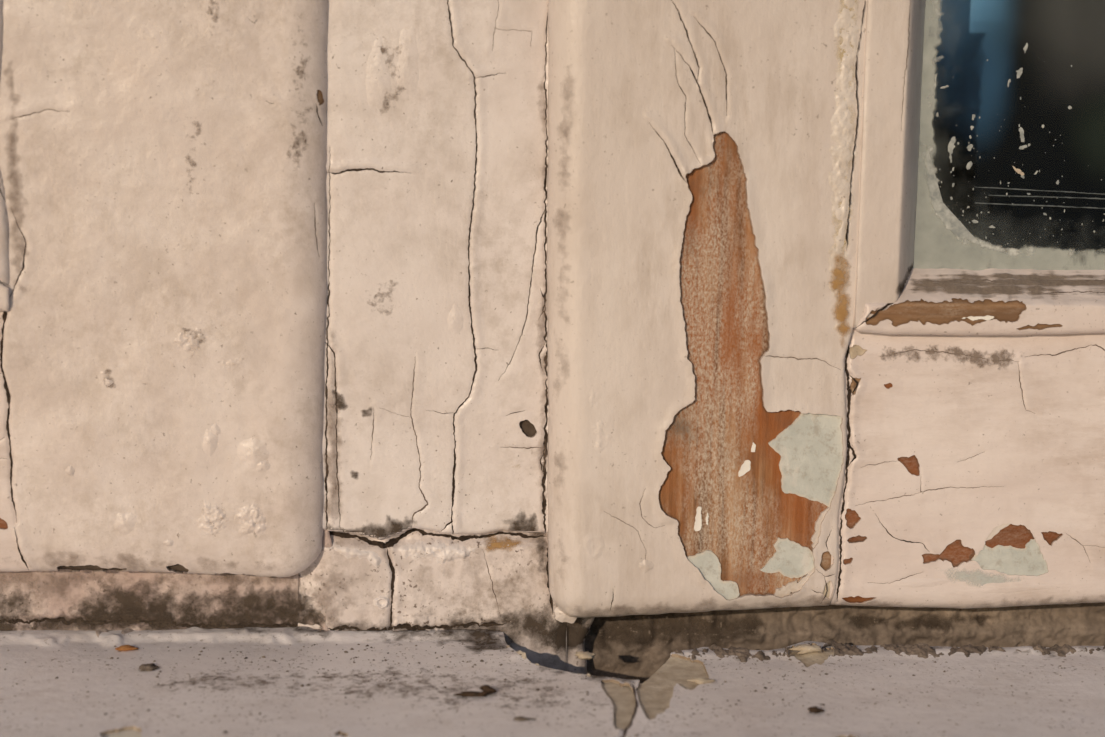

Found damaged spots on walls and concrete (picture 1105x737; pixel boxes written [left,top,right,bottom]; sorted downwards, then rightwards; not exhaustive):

crack [649,0,727,181]
crack [314,0,553,631]
peeling [866,298,1062,330]
crack [0,189,29,570]
peeling [658,131,852,600]
crack [879,344,1105,413]
peeling [845,509,867,543]
peeling [922,524,1062,576]
water stain [0,586,363,632]
water stain [440,608,762,650]
water stain [853,615,986,629]
peeling [601,657,716,730]